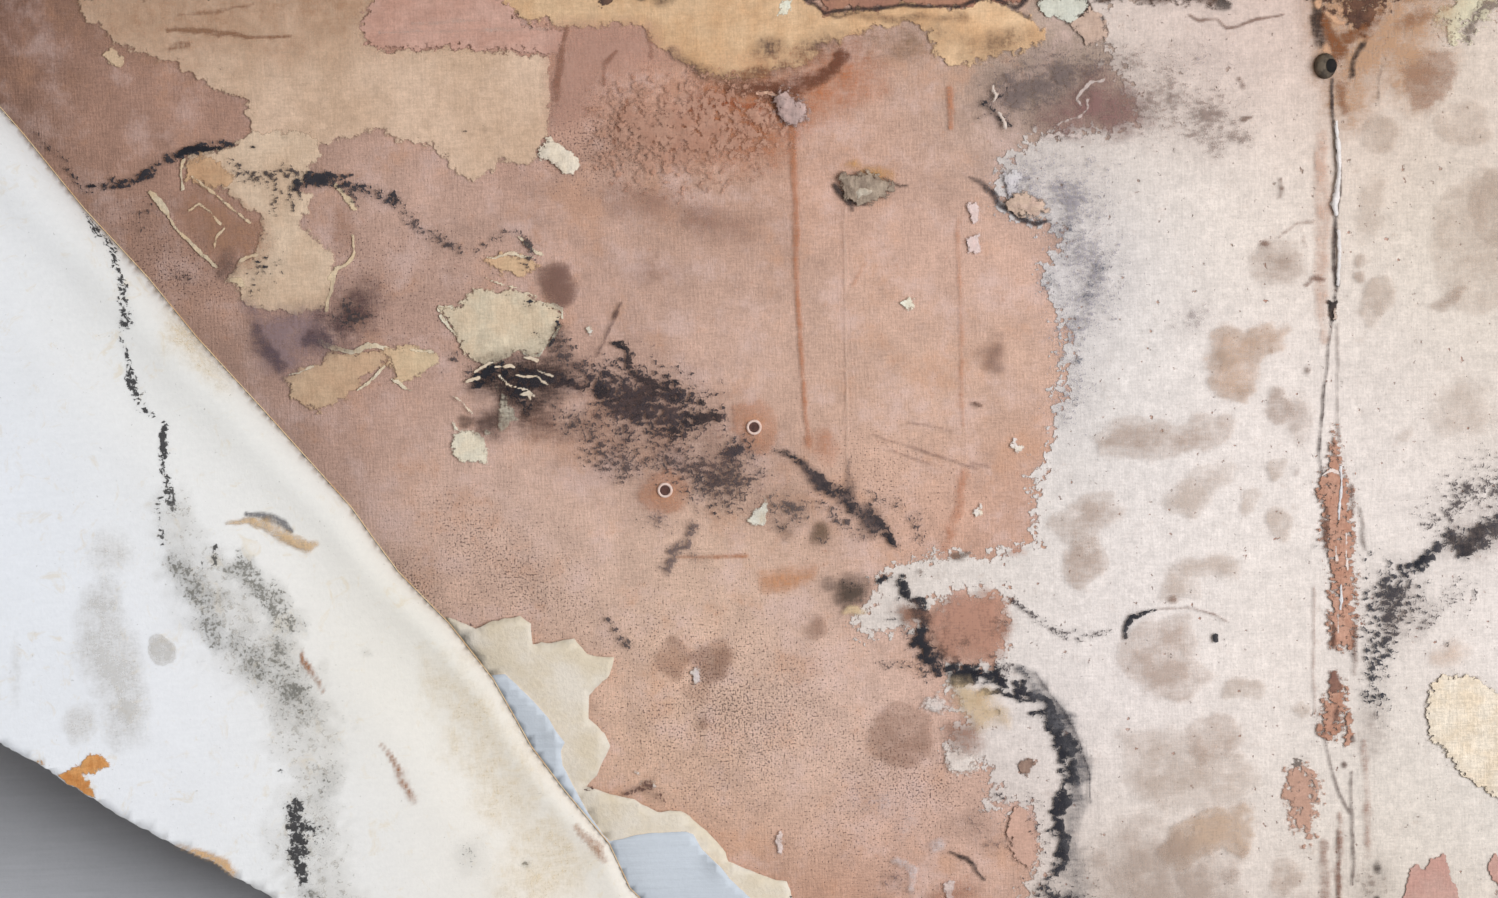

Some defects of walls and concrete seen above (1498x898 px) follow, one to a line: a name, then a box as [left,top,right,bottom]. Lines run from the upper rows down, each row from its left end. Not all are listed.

peeling [102,47,124,67]
flaking render [359,0,567,58]
damp [33,131,926,576]
flaking render [536,64,801,205]
peeling [777,0,792,16]
damp [977,30,1253,435]
crack [1319,79,1342,488]
peeling [0,108,639,898]
peeling [690,668,700,684]
damp [838,570,1251,898]
crack [1322,730,1355,898]
damp [1352,443,1498,727]